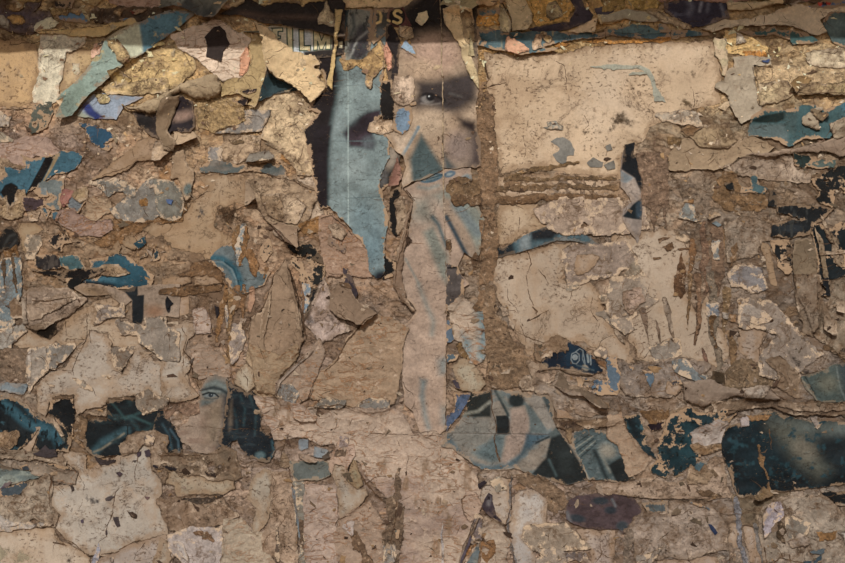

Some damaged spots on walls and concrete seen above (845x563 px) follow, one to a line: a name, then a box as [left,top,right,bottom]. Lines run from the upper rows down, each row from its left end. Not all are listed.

peeling [0,39,39,109]
peeling [253,0,343,103]
peeling [92,74,255,261]
peeling [440,0,765,367]
peeling [746,107,845,157]
peeling [248,259,307,355]
crack [507,250,547,343]
peeling [13,295,199,417]
peeling [452,358,486,392]
peeling [683,379,780,407]
peeling [0,445,236,563]
peeling [480,476,548,563]